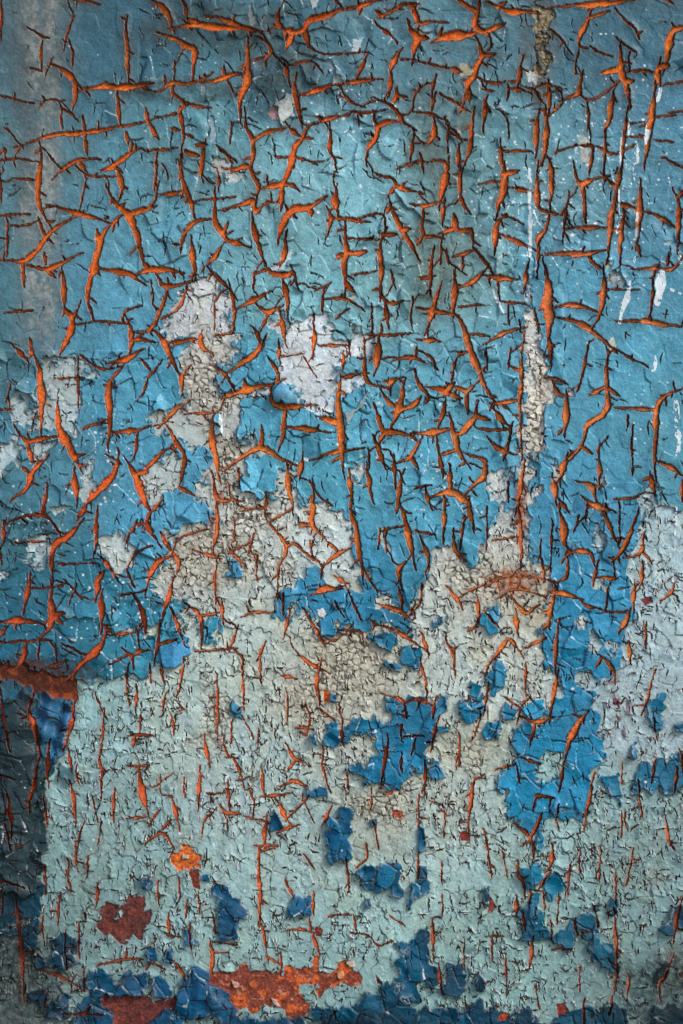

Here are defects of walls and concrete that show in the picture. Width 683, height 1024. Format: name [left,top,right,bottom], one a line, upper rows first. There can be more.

crack [626,415,642,476]
rust [0,659,86,702]
peeling [0,273,683,1024]
crack [588,642,619,693]
crack [494,709,593,793]
rust [170,845,202,890]
crack [338,788,381,898]
rust [83,896,156,946]
crack [326,901,400,961]
crack [656,868,683,945]
rust [100,993,178,1024]
rust [209,956,383,1020]